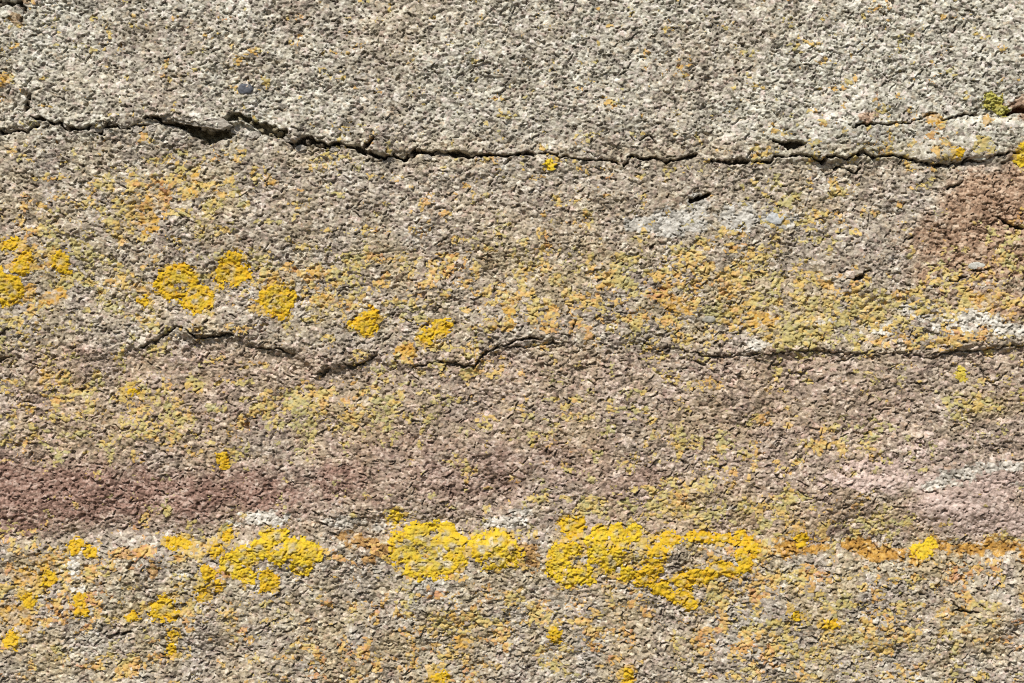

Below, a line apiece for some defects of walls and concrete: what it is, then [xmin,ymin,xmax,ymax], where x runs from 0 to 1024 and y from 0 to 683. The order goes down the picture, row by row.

crack [1,111,1017,190]
crack [141,326,284,352]
crack [318,334,392,377]
crack [413,325,574,368]
crack [635,341,1022,383]